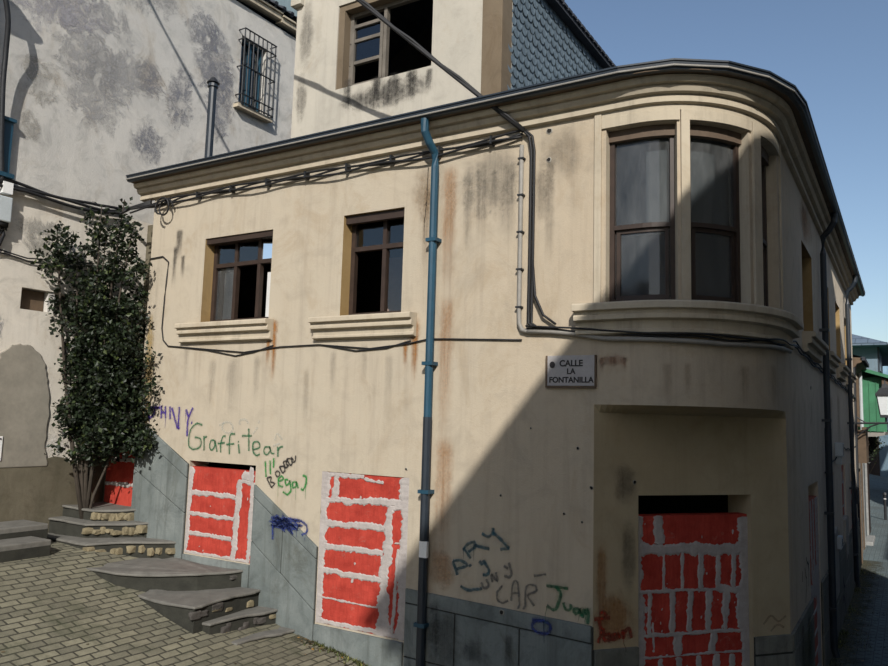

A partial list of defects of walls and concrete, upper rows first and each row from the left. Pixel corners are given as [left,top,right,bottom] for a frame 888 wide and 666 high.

leakage [347,71,414,105]